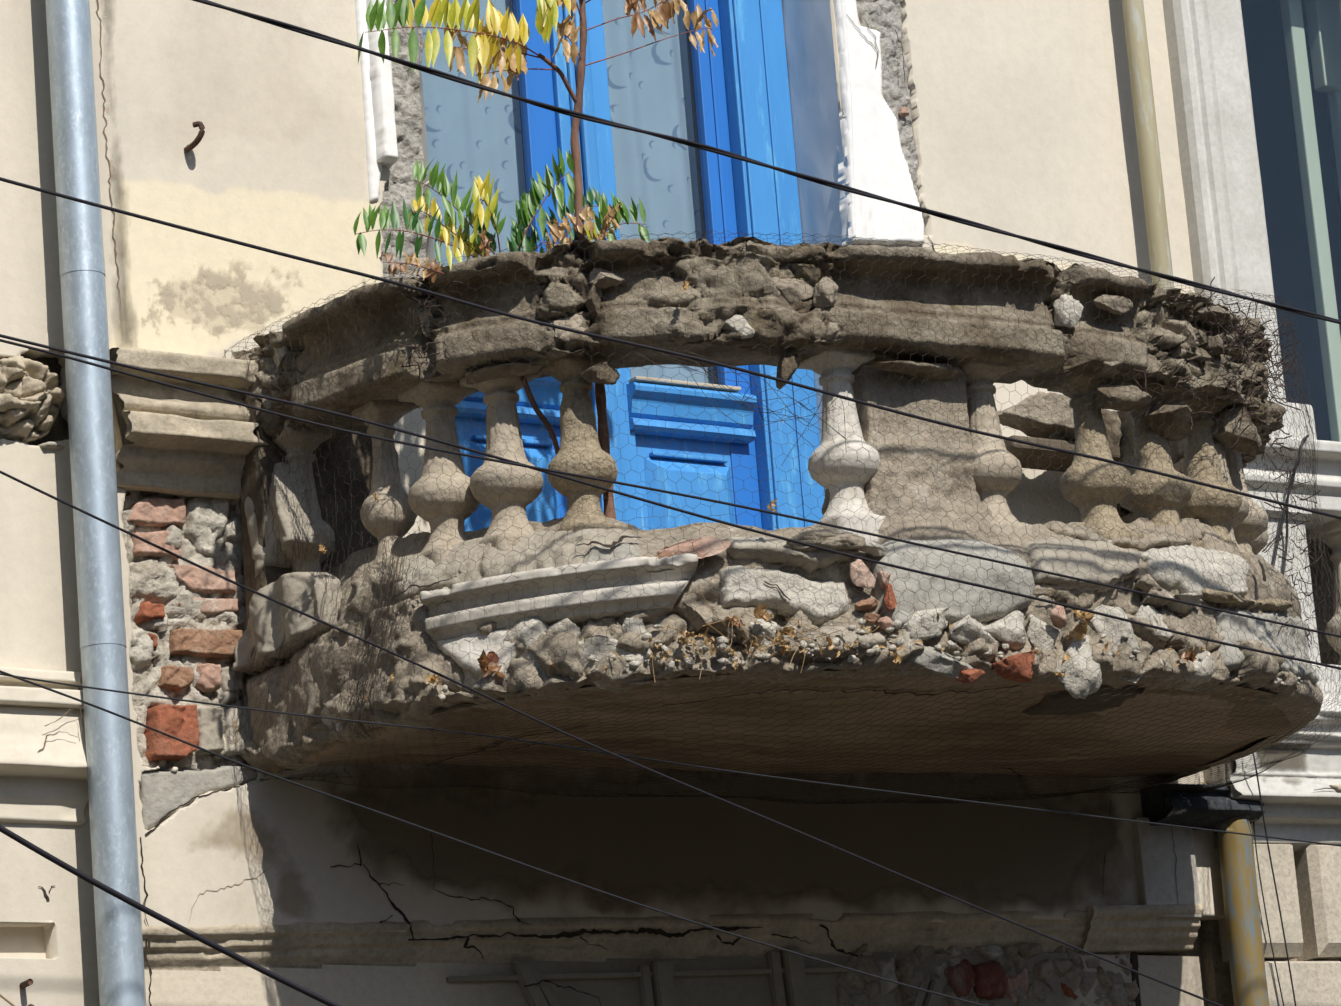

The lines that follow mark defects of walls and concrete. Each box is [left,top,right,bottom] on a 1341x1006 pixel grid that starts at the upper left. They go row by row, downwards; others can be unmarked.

spalling [856,0,920,202]
damp [160,267,285,334]
spalling [554,268,625,343]
spalling [722,314,755,339]
spalling [772,276,840,340]
spalling [1053,294,1133,329]
spalling [997,391,1075,441]
spalling [1093,361,1193,447]
spalling [487,529,1245,715]
flaking render [122,490,257,830]
crack [189,866,272,921]
crack [330,828,858,959]